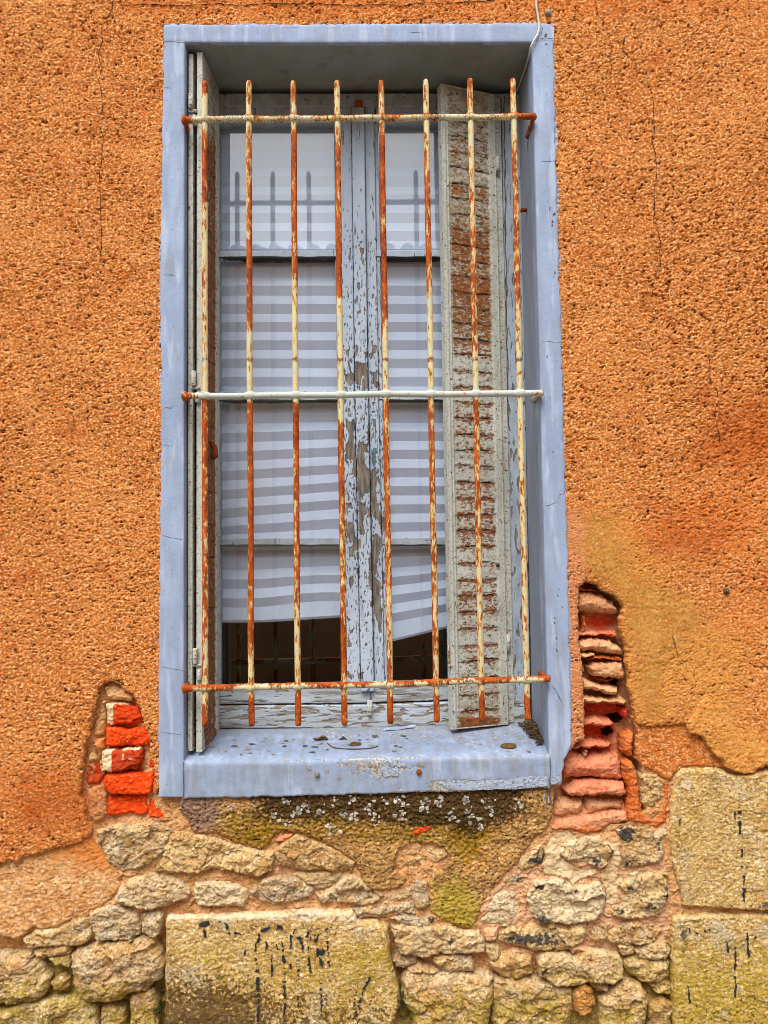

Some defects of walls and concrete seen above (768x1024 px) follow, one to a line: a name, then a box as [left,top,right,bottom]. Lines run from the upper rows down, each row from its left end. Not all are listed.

flaking render [86,682,165,825]
flaking render [436,514,698,833]